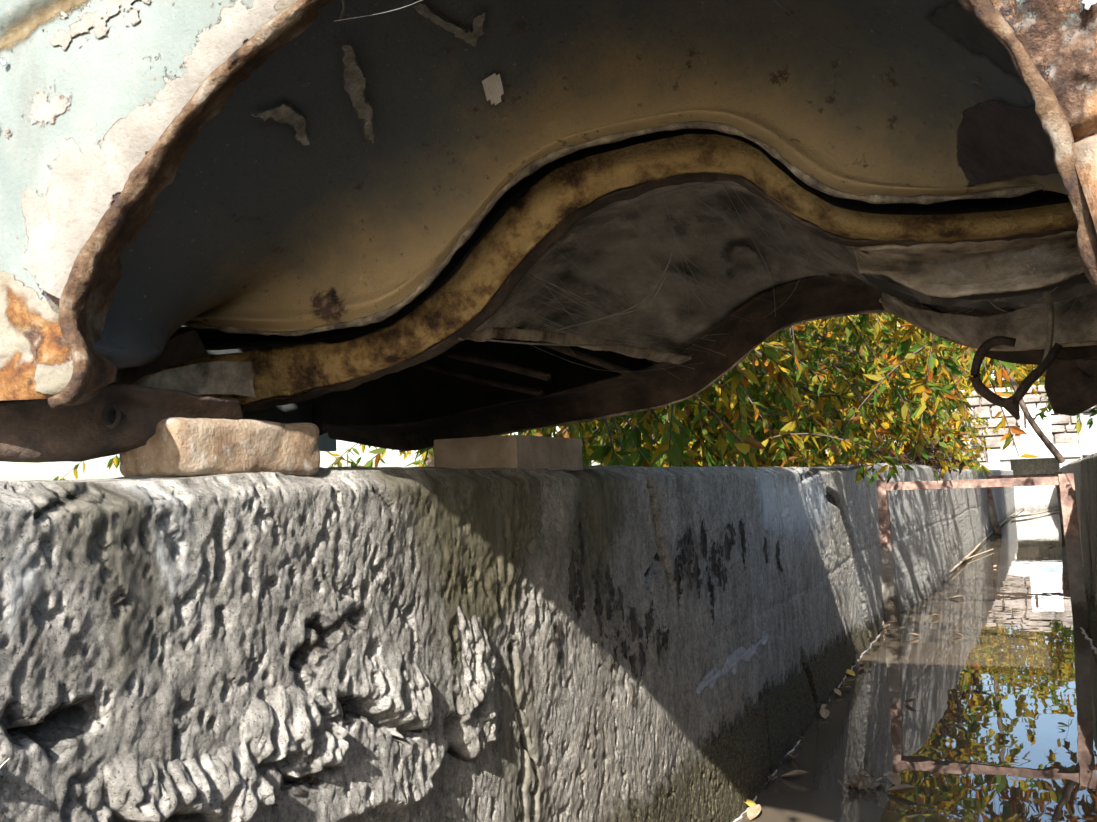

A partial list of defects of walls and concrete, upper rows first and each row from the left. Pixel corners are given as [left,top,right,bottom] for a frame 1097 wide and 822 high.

damp [572,469,620,577]
damp [758,471,827,536]
spalling [289,606,370,675]
spalling [0,696,96,759]